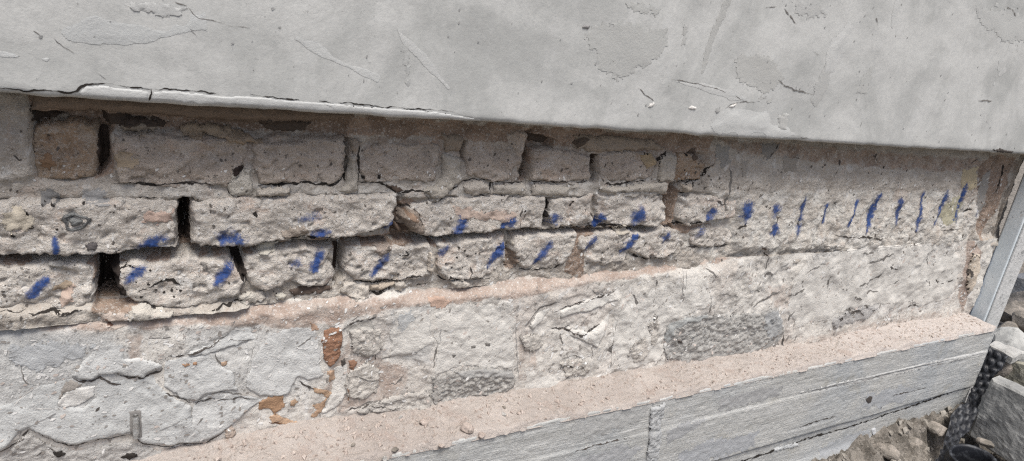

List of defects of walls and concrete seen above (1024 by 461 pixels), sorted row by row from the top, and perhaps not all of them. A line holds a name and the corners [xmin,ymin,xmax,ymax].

crack [0,73,216,131]
crack [252,94,469,117]
spalling [1,206,35,238]
spalling [394,204,425,234]
spalling [453,205,526,223]
spalling [366,235,392,257]
spalling [503,247,519,268]
crack [114,140,980,376]
flaking render [530,243,981,371]
flaking render [0,300,590,461]
crack [741,356,980,461]